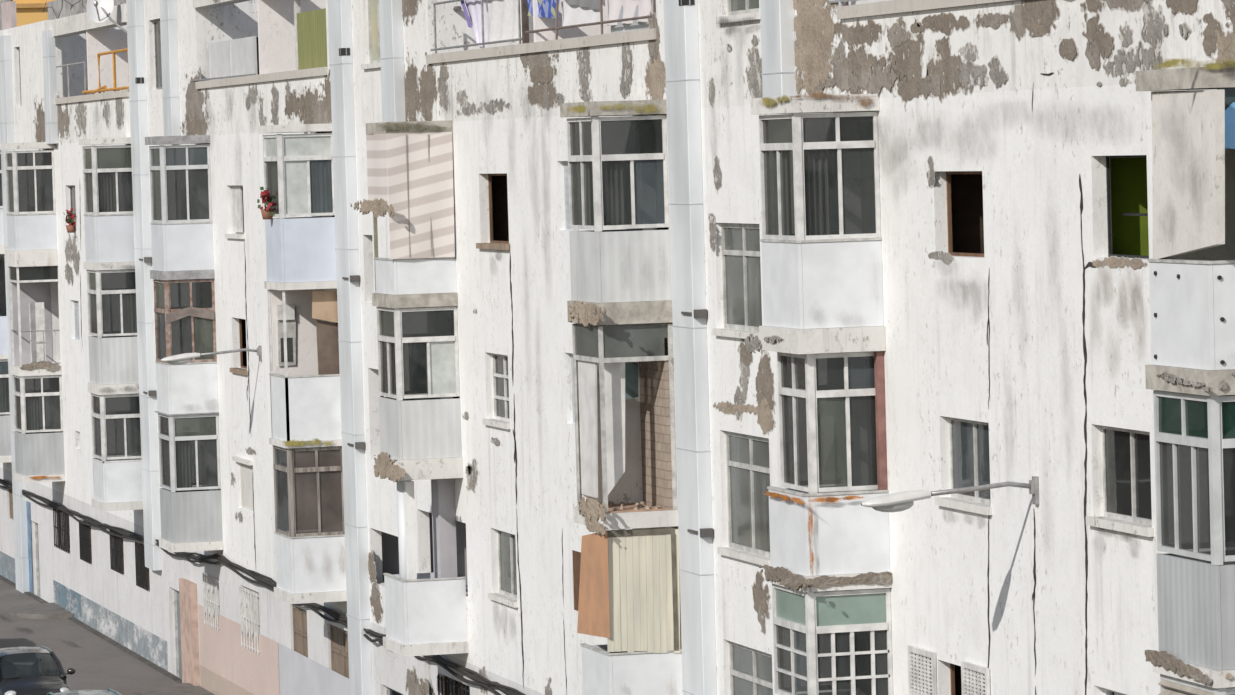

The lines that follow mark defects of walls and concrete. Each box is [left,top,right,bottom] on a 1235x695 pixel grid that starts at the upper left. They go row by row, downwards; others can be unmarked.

peeling [402,0,422,27]
peeling [180,67,211,135]
peeling [244,69,332,134]
peeling [404,47,510,122]
peeling [519,47,593,111]
peeling [619,12,666,116]
peeling [793,0,1235,111]
peeling [713,334,783,436]
crack [1079,174,1095,695]
corrosion [766,491,864,573]
spalling [751,564,893,635]
spalling [1145,650,1233,685]